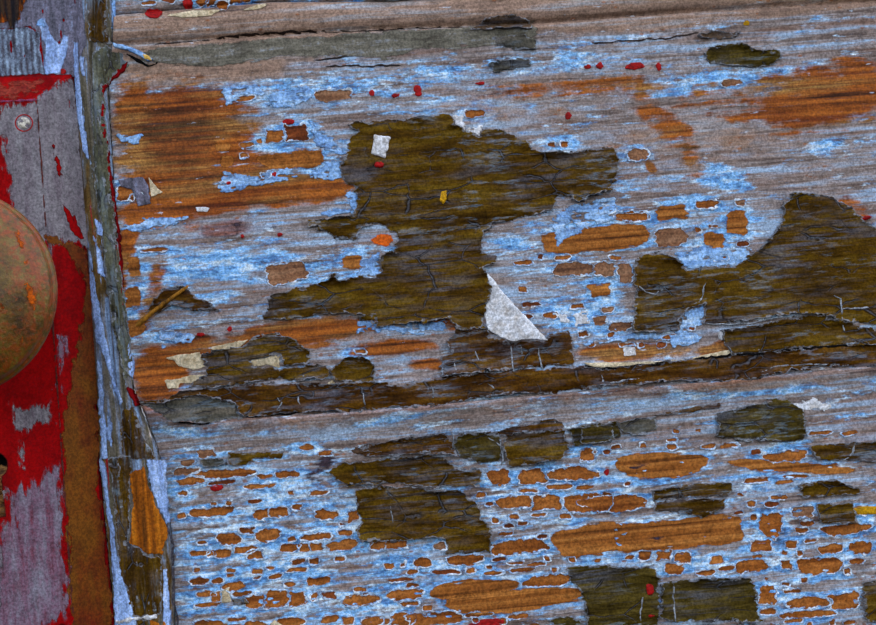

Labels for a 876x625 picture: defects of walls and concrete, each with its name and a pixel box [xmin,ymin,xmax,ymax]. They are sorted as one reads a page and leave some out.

peeling [141,0,266,18]
peeling [221,84,354,109]
peeling [719,78,743,87]
peeling [0,0,189,405]
rust [24,282,37,310]
peeling [96,109,876,625]
peeling [0,321,74,625]